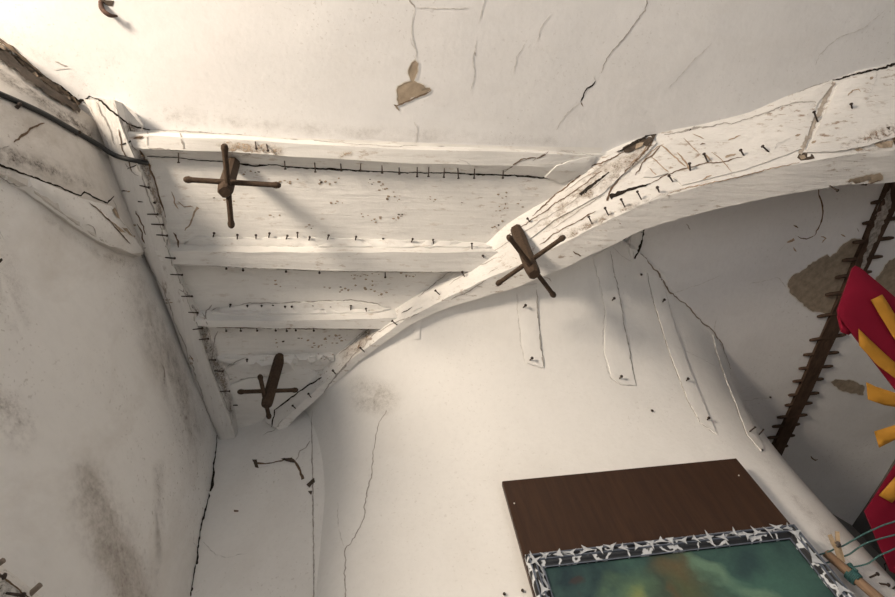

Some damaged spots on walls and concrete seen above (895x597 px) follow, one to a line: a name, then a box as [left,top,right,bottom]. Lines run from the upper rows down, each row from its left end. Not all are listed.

flaking render [0,38,82,113]
peeling [394,59,432,110]
crack [409,0,485,91]
crack [557,0,648,129]
peeling [846,172,884,186]
crack [217,63,895,451]
peeling [787,189,895,314]
crack [0,96,387,597]